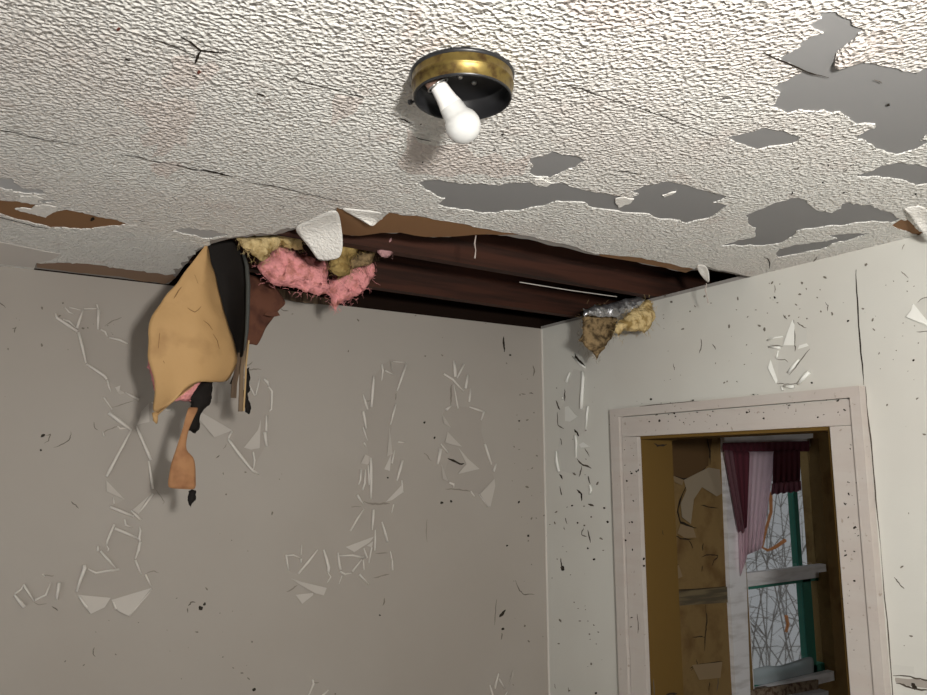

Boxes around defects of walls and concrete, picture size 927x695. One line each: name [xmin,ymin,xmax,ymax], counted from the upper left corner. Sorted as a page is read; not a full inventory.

crack [138,34,226,78]
peeling [771,12,927,185]
peeling [728,128,800,149]
crack [121,154,336,208]
peeling [419,152,727,223]
peeling [296,208,380,261]
peeling [725,198,927,257]
peeling [697,265,709,282]
crack [772,315,810,385]
peeling [200,380,271,469]
crack [856,279,927,695]
crack [662,439,725,689]